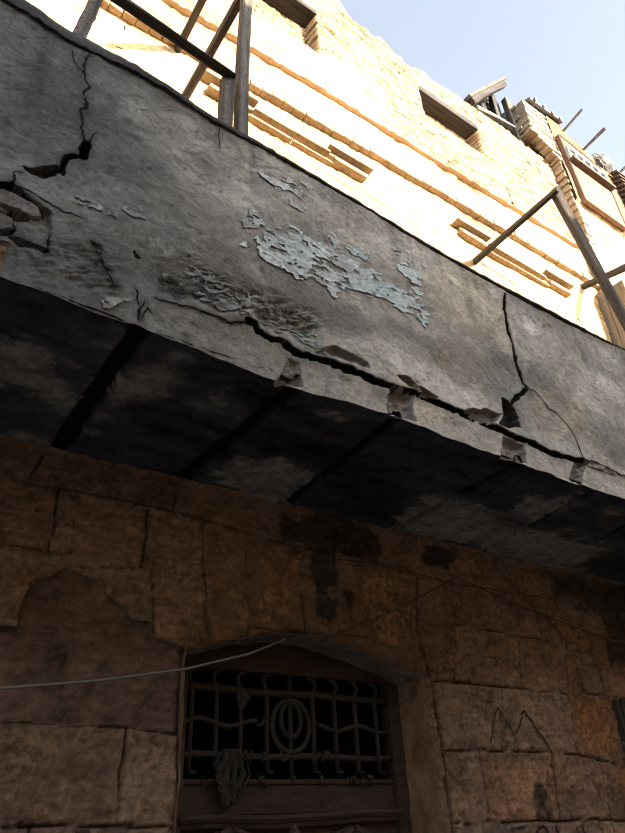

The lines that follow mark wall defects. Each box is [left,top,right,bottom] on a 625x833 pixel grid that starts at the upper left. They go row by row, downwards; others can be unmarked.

crack [58,49,98,176]
flaking render [0,189,51,267]
spalling [22,165,60,179]
crack [95,248,114,285]
peeling [158,252,370,368]
peeling [239,207,430,328]
crack [135,262,625,476]
flaking render [463,398,521,429]
damp [209,457,313,503]
damp [387,491,625,662]